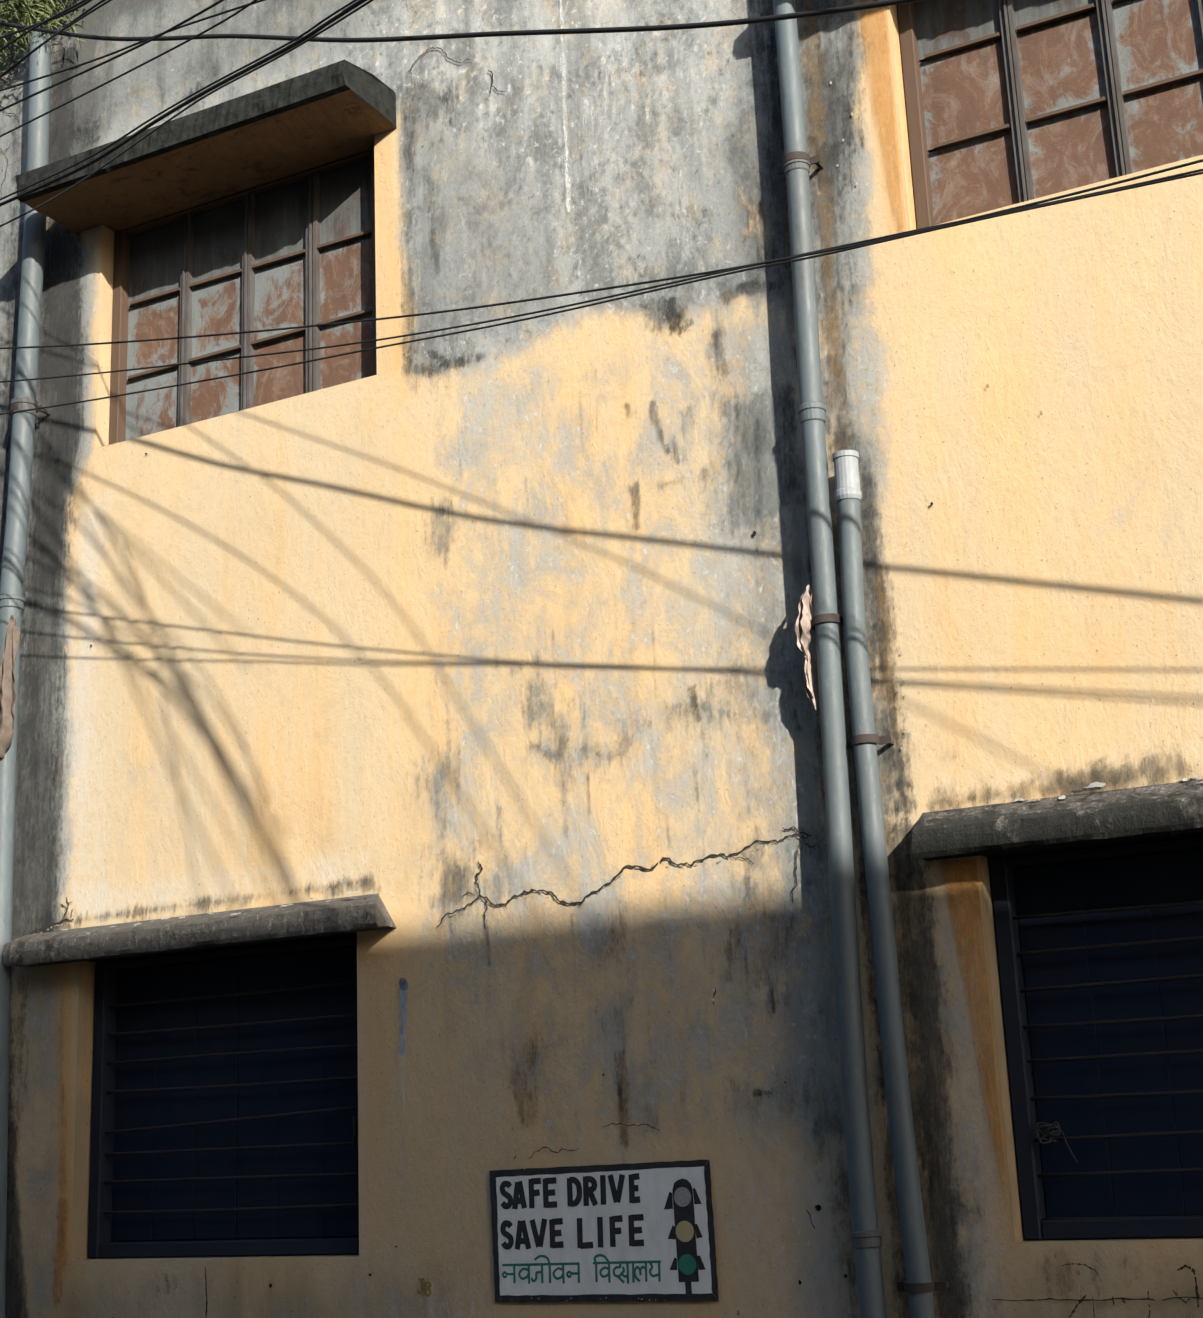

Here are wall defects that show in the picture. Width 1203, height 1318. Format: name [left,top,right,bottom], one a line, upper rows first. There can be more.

leakage [49,47,101,164]
leakage [563,120,571,212]
leakage [723,0,790,303]
leakage [0,222,24,561]
leakage [408,349,484,375]
leakage [645,296,693,335]
leakage [12,218,85,936]
leakage [1043,756,1192,796]
crack [437,826,817,930]
leakage [830,425,971,1318]
leakage [5,1127,26,1318]